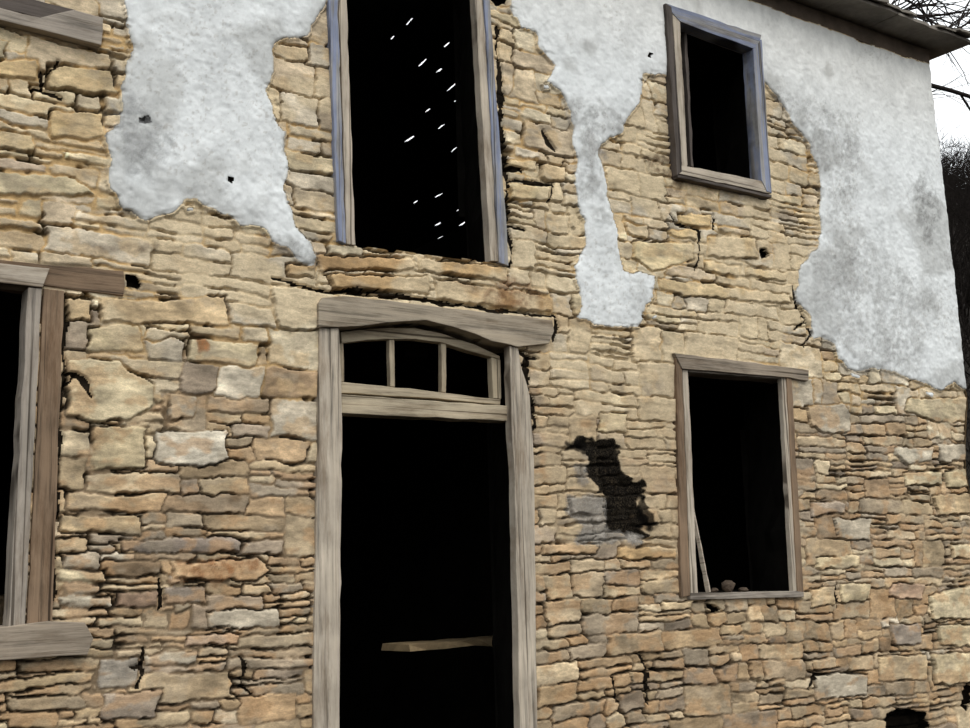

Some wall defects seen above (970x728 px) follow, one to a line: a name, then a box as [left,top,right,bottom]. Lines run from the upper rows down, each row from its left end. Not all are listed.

flaking render [491,0,966,397]
crack [669,213,715,271]
crack [792,285,811,348]
crack [58,293,92,465]
crack [54,492,62,520]
damp [564,495,643,545]
crack [51,550,59,601]
crack [129,647,145,689]
crack [237,656,253,694]